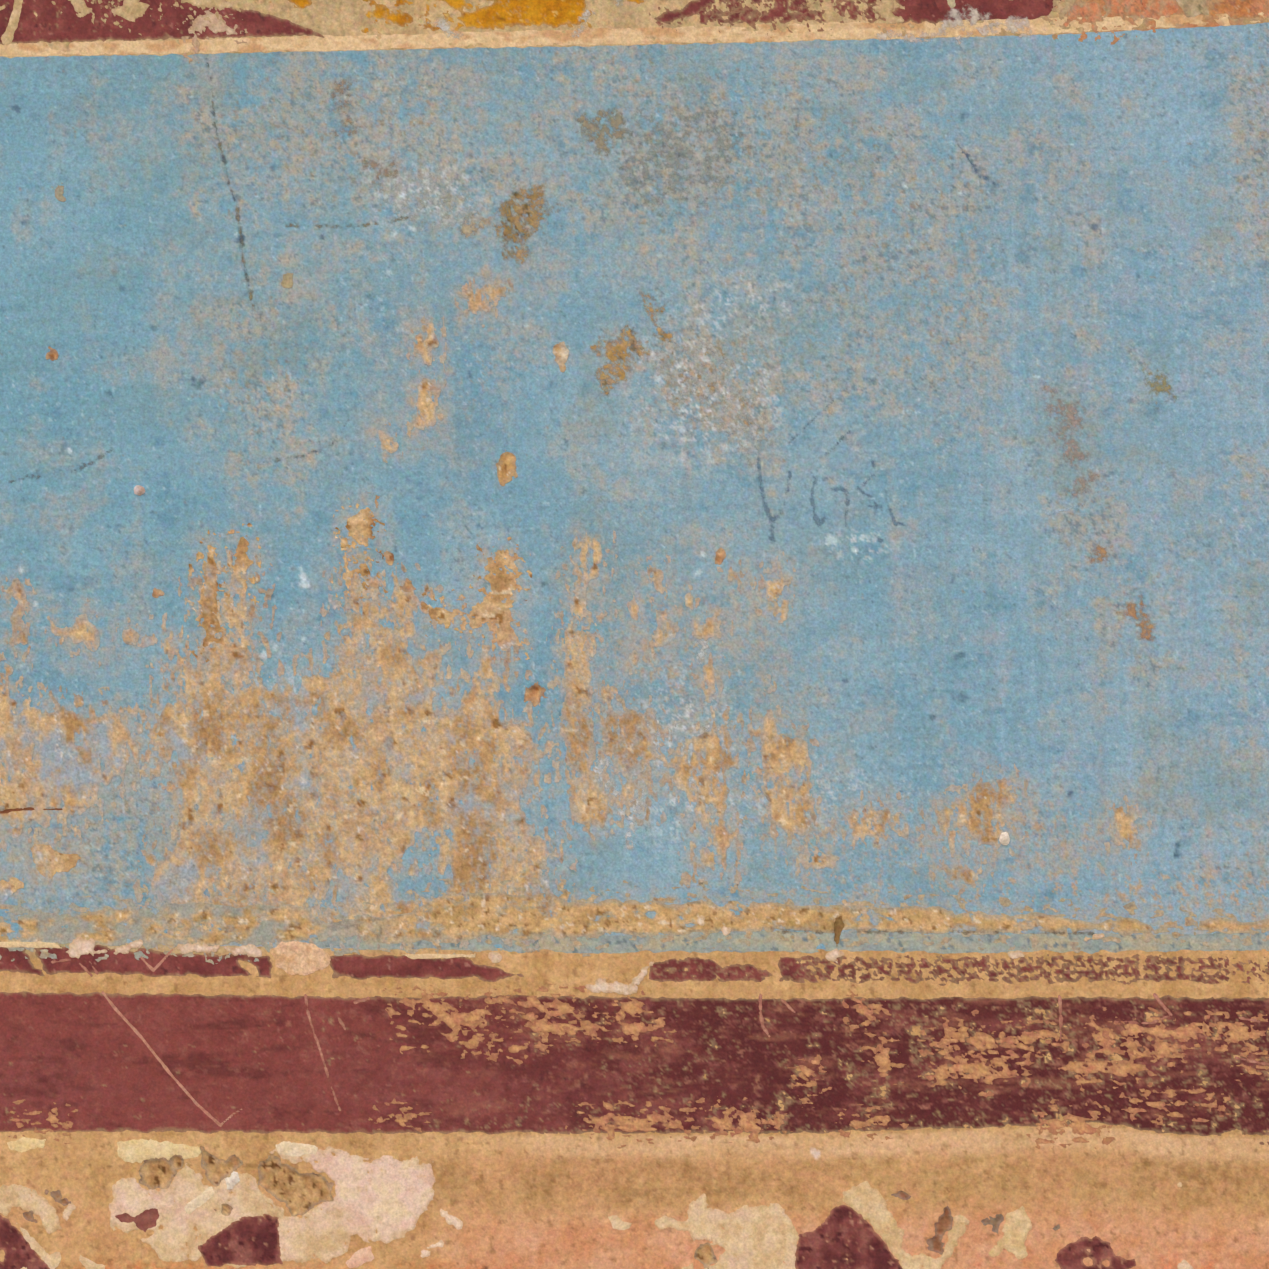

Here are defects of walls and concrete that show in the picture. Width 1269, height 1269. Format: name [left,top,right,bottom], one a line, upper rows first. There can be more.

peeling [52,0,253,63]
peeling [862,0,914,36]
peeling [0,495,1269,995]
flaking render [7,1137,46,1153]
flaking render [0,1184,76,1269]
flaking render [79,1255,105,1269]
flaking render [109,1139,463,1269]
flaking render [608,1215,632,1230]
flaking render [654,1193,799,1269]
flaking render [842,1181,1032,1269]